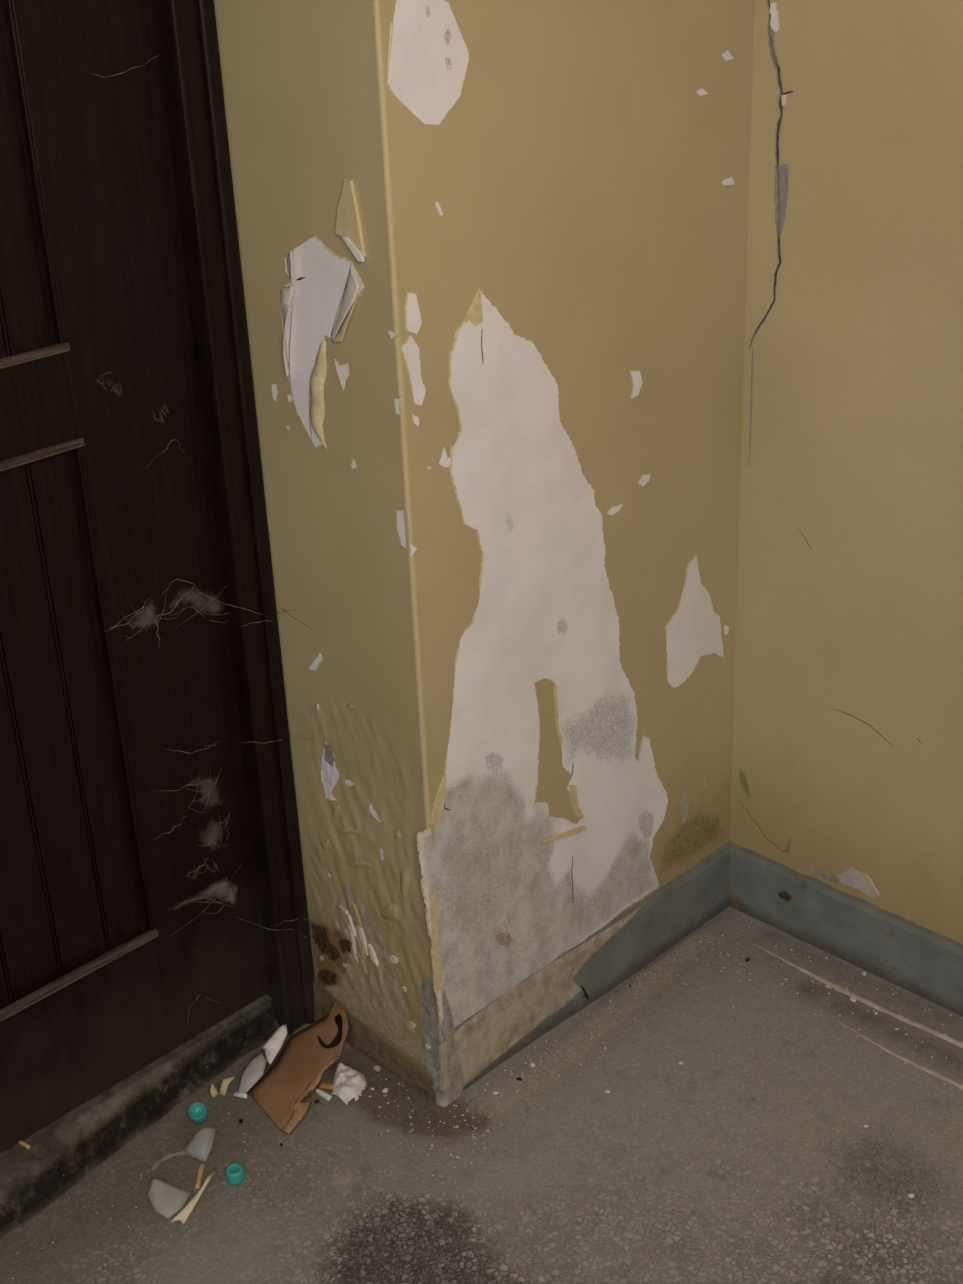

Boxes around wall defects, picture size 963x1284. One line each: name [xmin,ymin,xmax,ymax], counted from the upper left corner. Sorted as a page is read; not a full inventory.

peeling [387,0,470,126]
crack [749,0,794,462]
peeling [272,179,366,450]
spalling [309,654,323,672]
peeling [320,288,669,1107]
peeling [665,555,729,689]
spalling [808,867,880,900]
damp [314,1168,560,1284]